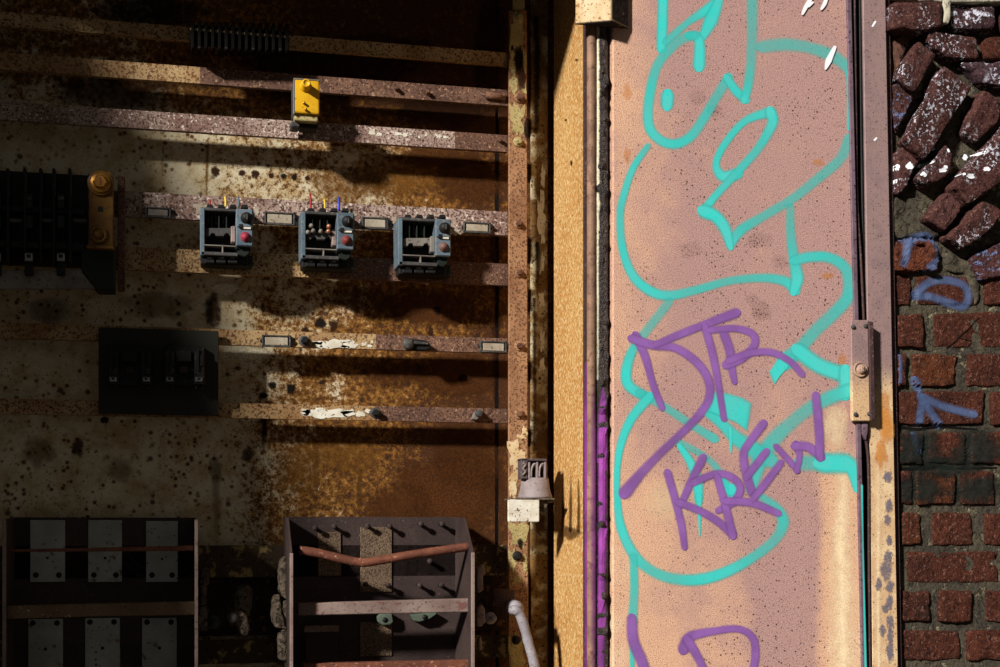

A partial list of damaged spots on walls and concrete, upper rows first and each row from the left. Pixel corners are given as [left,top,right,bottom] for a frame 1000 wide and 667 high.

peeling [509,11,527,136]
corrosion [205,146,220,196]
corrosion [239,148,501,211]
peeling [312,339,373,349]
peeling [301,408,370,419]
corrosion [368,423,503,542]
peeling [507,426,528,498]
corrosion [876,409,892,465]